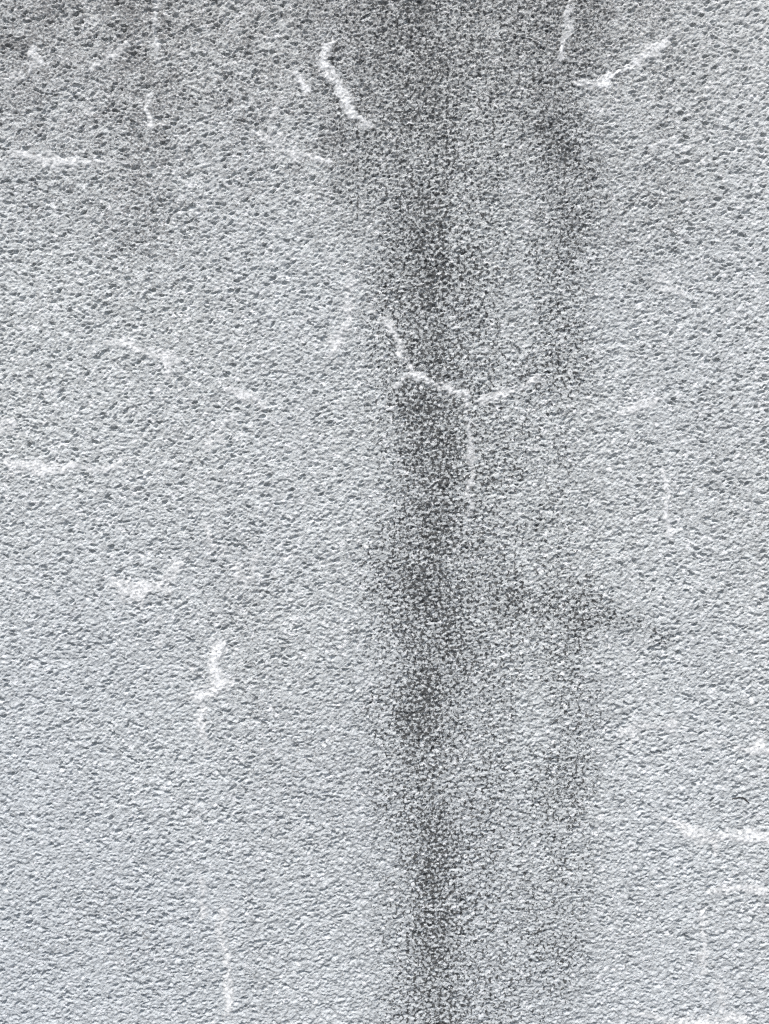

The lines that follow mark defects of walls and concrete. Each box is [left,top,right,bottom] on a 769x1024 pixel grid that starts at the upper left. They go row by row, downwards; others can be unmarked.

crack [559,0,573,60]
crack [574,30,680,90]
crack [327,271,544,516]
leakage [306,0,670,1024]